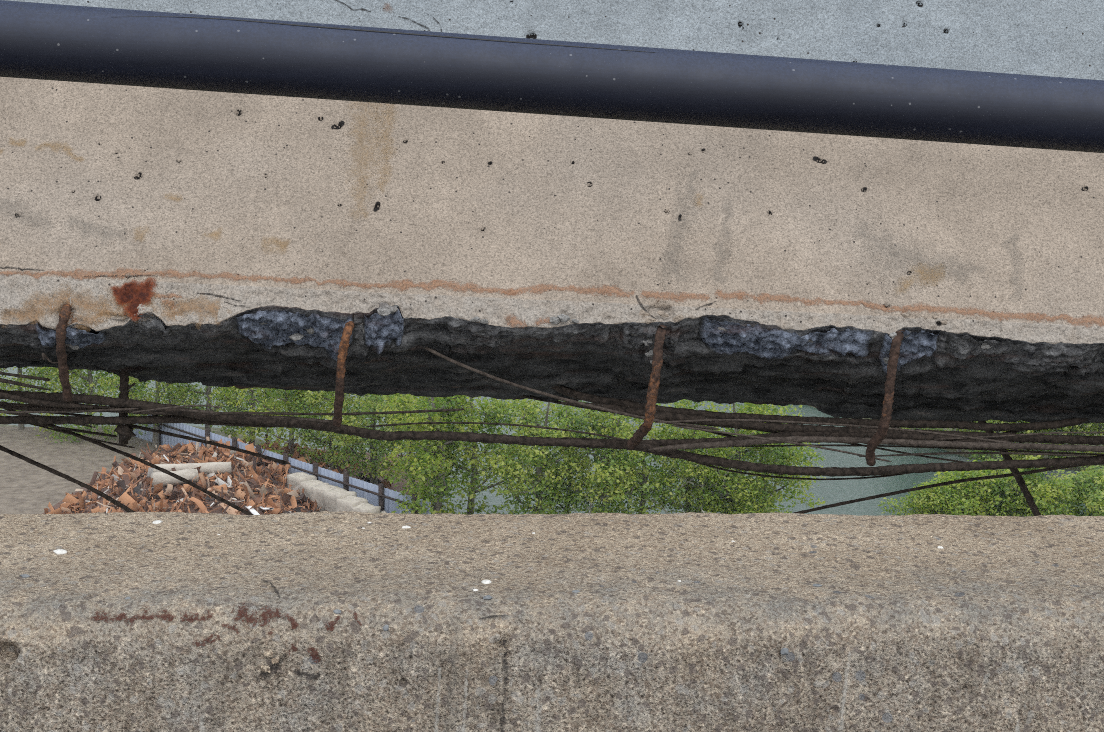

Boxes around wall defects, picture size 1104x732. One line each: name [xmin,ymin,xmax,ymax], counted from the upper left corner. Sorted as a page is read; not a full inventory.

rust [0,269,1104,327]
spalling [28,320,107,350]
spalling [137,313,174,339]
spalling [234,302,408,361]
spalling [446,316,501,348]
spalling [549,309,683,364]
spalling [696,304,1104,374]
rust [91,607,213,627]
rust [192,604,299,647]
rust [325,611,362,631]
rust [289,644,320,663]